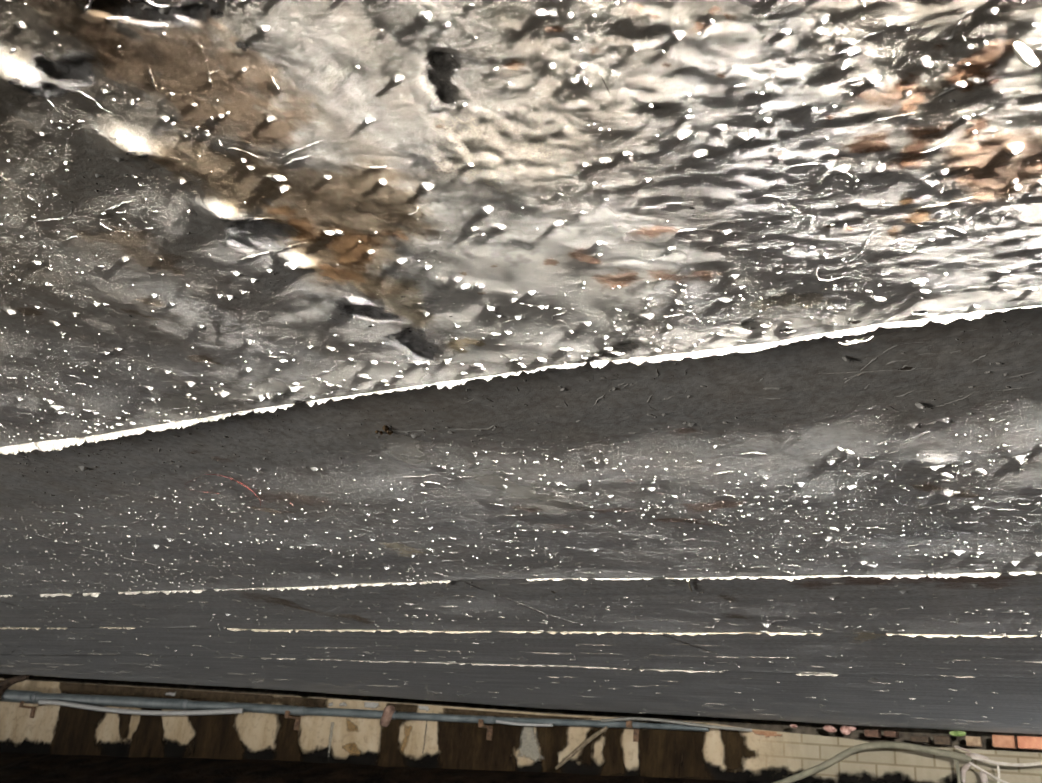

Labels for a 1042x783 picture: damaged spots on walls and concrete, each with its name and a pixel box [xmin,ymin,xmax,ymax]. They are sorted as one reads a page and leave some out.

corrosion [944,39,1014,92]
corrosion [858,74,930,114]
corrosion [160,156,181,172]
leakage [26,0,1042,364]
corrosion [842,124,952,169]
corrosion [947,118,1042,202]
corrosion [266,206,407,282]
corrosion [632,226,680,237]
corrosion [888,198,933,236]
corrosion [569,248,722,288]